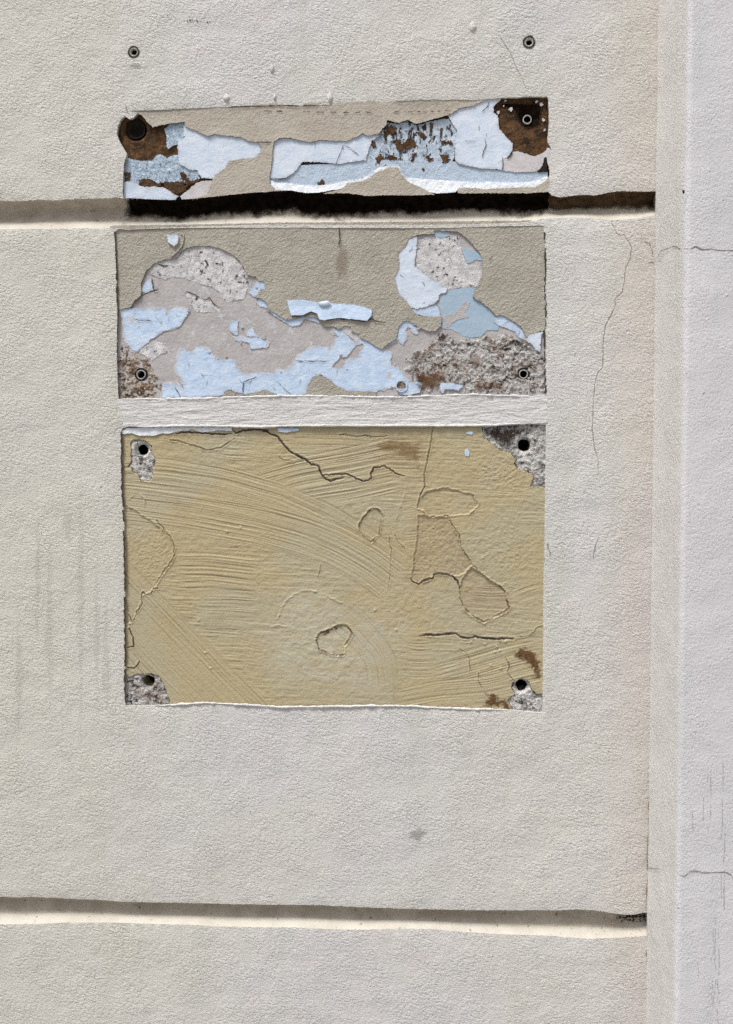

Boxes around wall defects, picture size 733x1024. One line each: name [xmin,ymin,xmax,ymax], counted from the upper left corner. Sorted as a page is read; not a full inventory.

peeling [118,98,551,200]
peeling [110,220,547,399]
crack [592,221,733,457]
crack [170,429,433,494]
crack [127,521,175,669]
peeling [120,424,546,712]
crack [316,626,353,656]
crack [359,508,543,685]
rust [483,693,511,709]
rust [514,647,541,679]